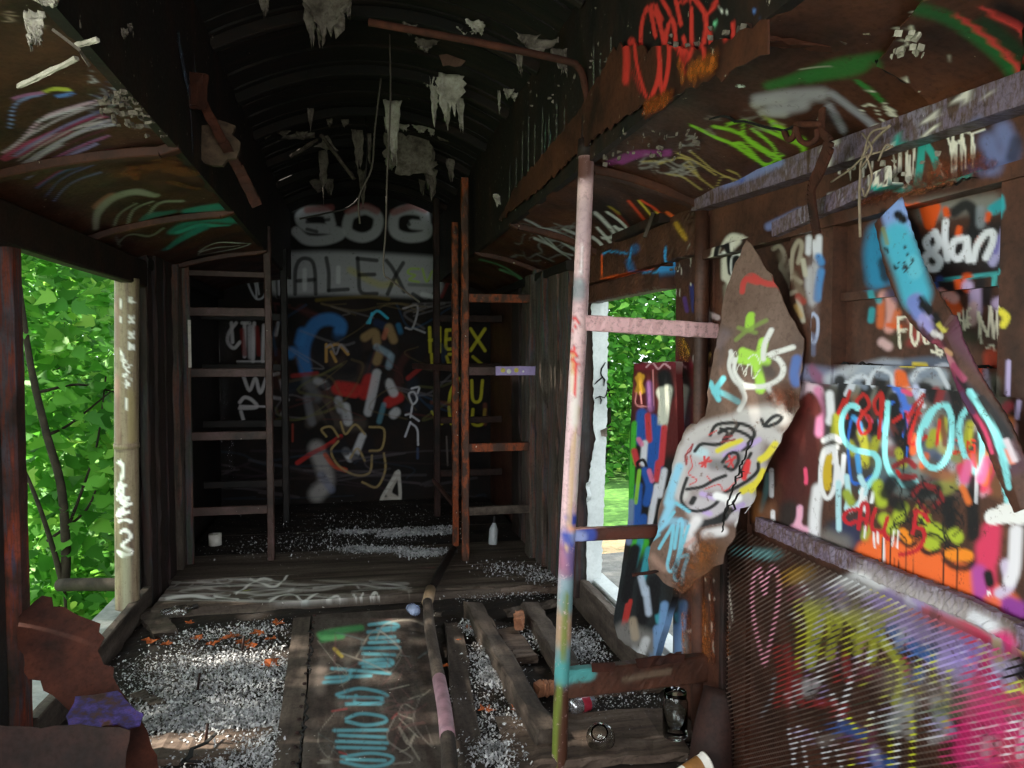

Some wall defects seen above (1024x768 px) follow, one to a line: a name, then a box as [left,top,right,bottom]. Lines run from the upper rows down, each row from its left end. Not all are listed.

peeling [23,0,60,52]
peeling [302,0,352,49]
peeling [402,21,438,53]
peeling [456,18,485,36]
peeling [668,23,747,47]
peeling [497,32,576,114]
peeling [309,150,334,204]
peeling [326,118,372,205]
peeling [383,72,467,201]